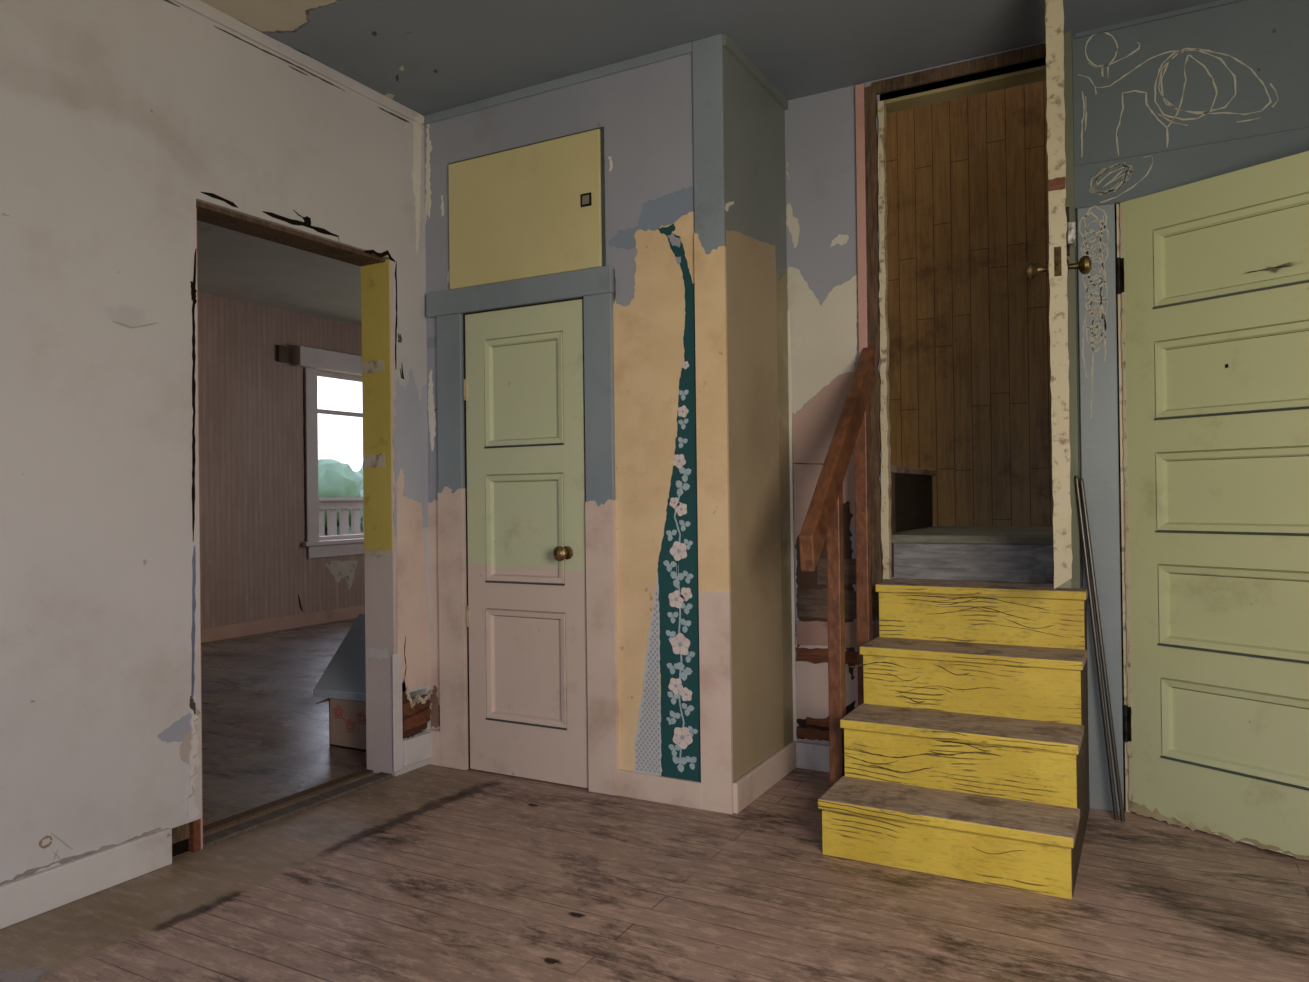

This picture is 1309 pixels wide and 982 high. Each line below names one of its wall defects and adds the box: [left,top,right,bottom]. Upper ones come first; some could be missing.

peeling [200,0,342,33]
crack [201,192,404,379]
peeling [786,203,800,248]
peeling [428,370,436,451]
peeling [363,453,440,739]
peeling [585,211,858,814]
flaking render [843,449,879,715]